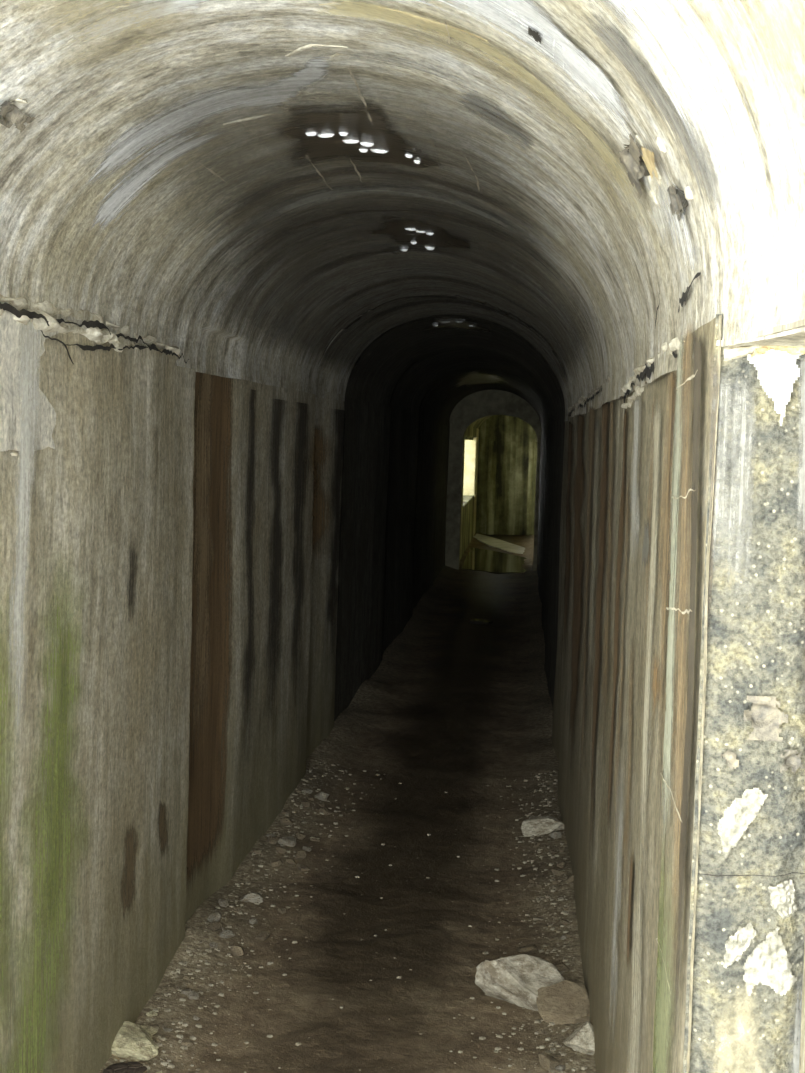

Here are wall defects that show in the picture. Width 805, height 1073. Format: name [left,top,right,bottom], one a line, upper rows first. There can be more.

spalling [0,99,36,132]
spalling [619,134,693,242]
flaking render [0,310,61,456]
crack [0,294,189,365]
crack [568,272,701,416]
spalling [723,345,805,426]
rust [645,372,676,710]
rust [187,372,233,880]
rust [563,402,633,964]
water stain [792,984,803,1073]